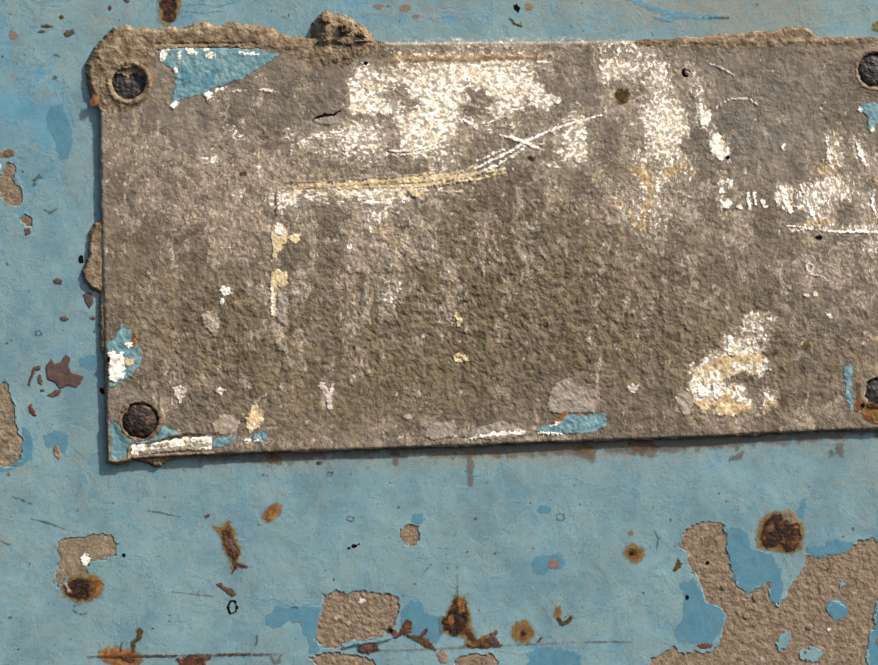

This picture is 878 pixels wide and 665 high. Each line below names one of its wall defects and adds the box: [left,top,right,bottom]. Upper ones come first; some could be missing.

corrosion [158,0,181,25]
peeling [160,47,216,73]
peeling [0,382,68,472]
corrosion [854,398,878,424]
peeling [53,533,126,588]
corrosion [215,520,248,574]
corrosion [756,508,804,553]
corrosion [61,574,104,602]
peeling [650,521,878,665]
corrosion [98,628,144,665]
peeling [265,590,499,665]
corrosion [442,596,502,648]